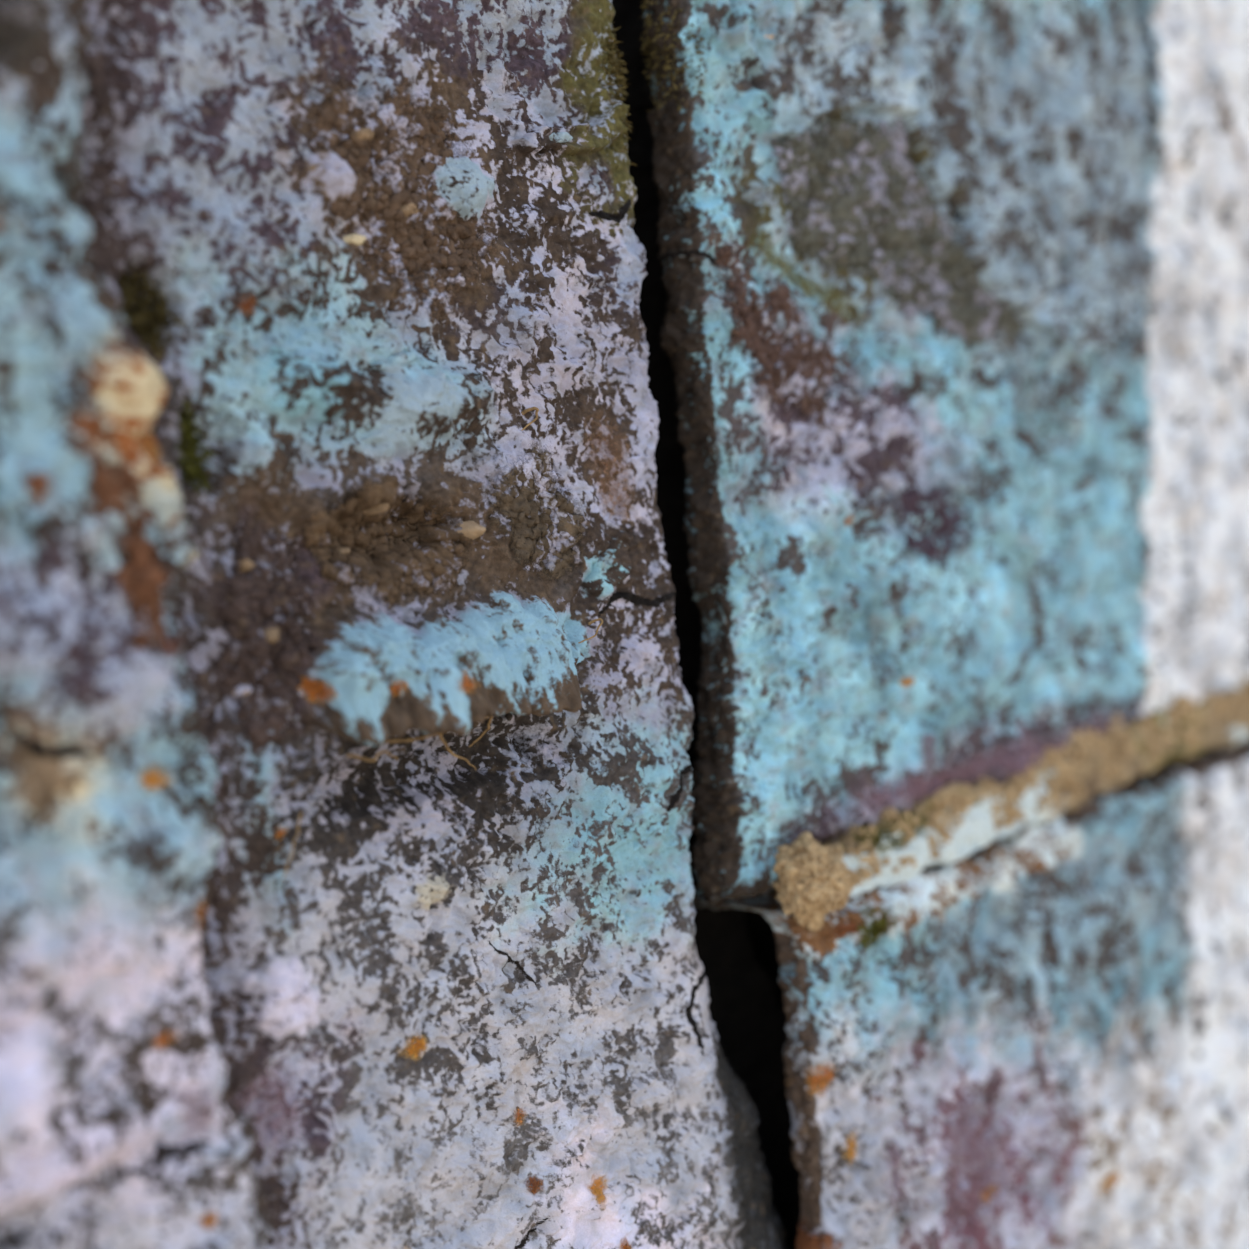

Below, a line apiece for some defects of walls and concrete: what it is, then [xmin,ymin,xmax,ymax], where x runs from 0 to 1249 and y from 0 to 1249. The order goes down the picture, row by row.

spalling [209,352,634,760]
crack [588,0,721,846]
crack [685,904,801,1249]